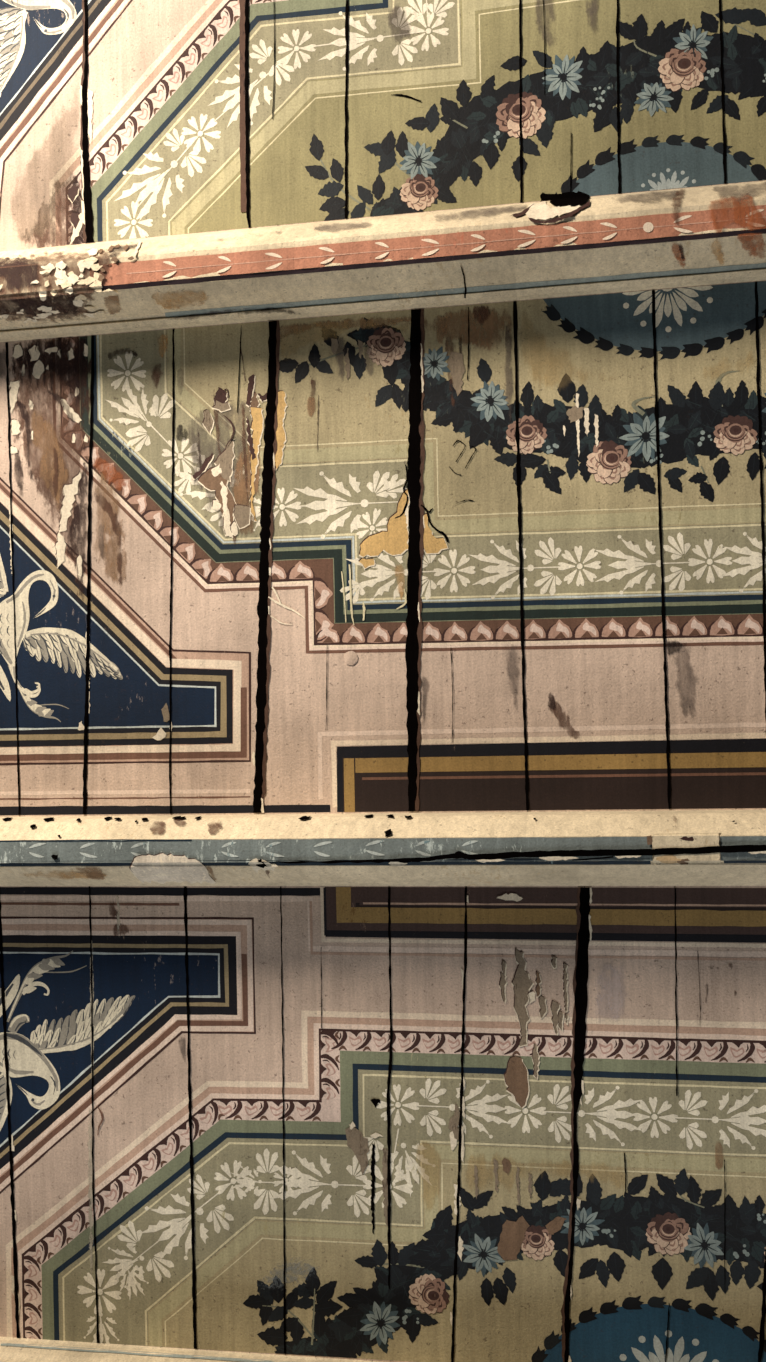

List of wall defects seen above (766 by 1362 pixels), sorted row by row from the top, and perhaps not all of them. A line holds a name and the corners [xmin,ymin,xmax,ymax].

peeling [8,343,88,454]
peeling [54,471,82,576]
peeling [0,241,142,323]
crack [79,0,94,243]
peeling [193,374,288,538]
crack [218,320,280,813]
spalling [358,489,449,570]
crack [395,309,476,811]
crack [513,301,529,810]
peeling [511,191,590,224]
crack [652,290,671,809]
crack [274,845,766,1362]